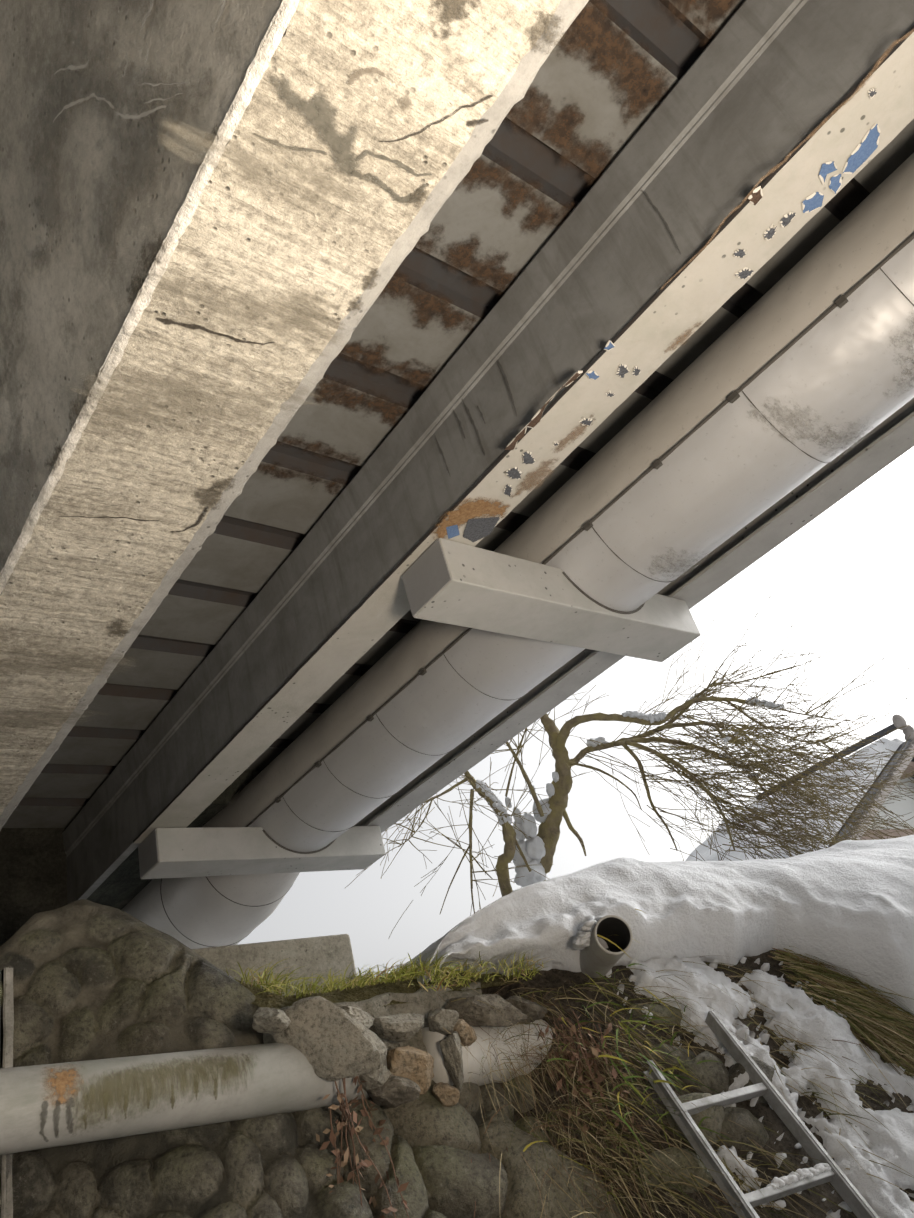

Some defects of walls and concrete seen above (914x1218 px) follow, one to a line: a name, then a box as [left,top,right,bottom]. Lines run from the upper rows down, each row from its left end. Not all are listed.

corrosion [669,0,738,44]
corrosion [559,0,668,123]
crack [254,78,493,203]
corrosion [506,88,611,186]
corrosion [463,159,575,231]
peeling [748,186,763,205]
peeling [763,122,881,241]
peeling [733,249,754,279]
crack [156,318,274,345]
corrosion [39,1068,79,1142]
damp [75,1057,250,1129]